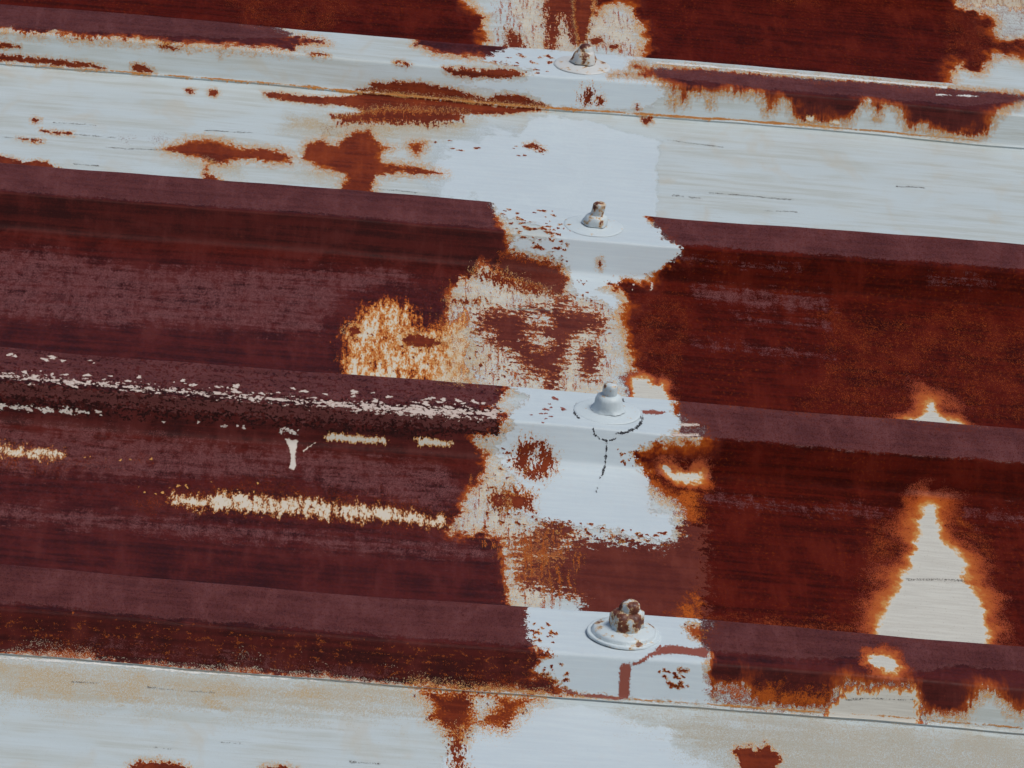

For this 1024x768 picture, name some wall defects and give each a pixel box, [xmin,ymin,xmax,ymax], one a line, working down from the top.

corrosion [0,0,1024,146]
peeling [0,355,502,423]
peeling [324,432,389,446]
peeling [413,436,454,448]
corrosion [504,429,565,486]
peeling [123,472,468,538]
corrosion [632,644,709,666]
corrosion [580,662,632,701]
corrosion [715,700,770,712]
corrosion [727,738,789,768]